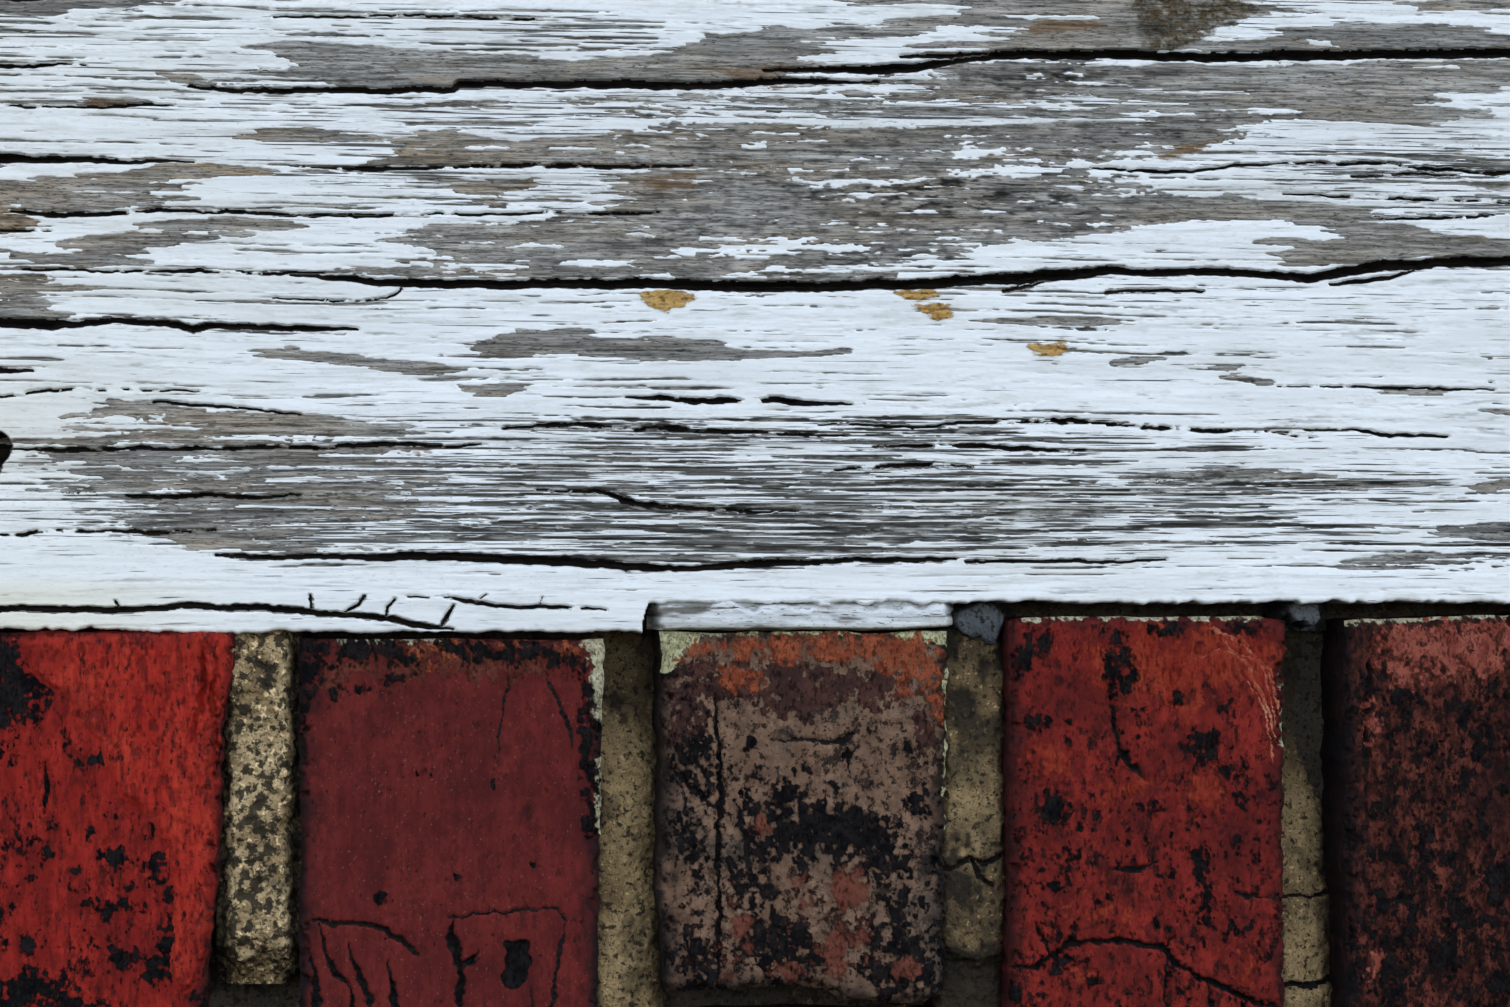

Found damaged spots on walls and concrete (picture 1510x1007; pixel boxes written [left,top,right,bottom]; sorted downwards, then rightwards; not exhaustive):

crack [0,48,1510,109]
peeling [232,0,1510,283]
peeling [0,163,310,320]
crack [0,208,660,232]
crack [1091,161,1510,220]
crack [0,256,1510,333]
peeling [251,346,530,397]
peeling [468,328,853,361]
crack [0,367,1448,471]
peeling [0,398,481,555]
crack [0,492,1167,630]
peeling [1328,522,1510,571]